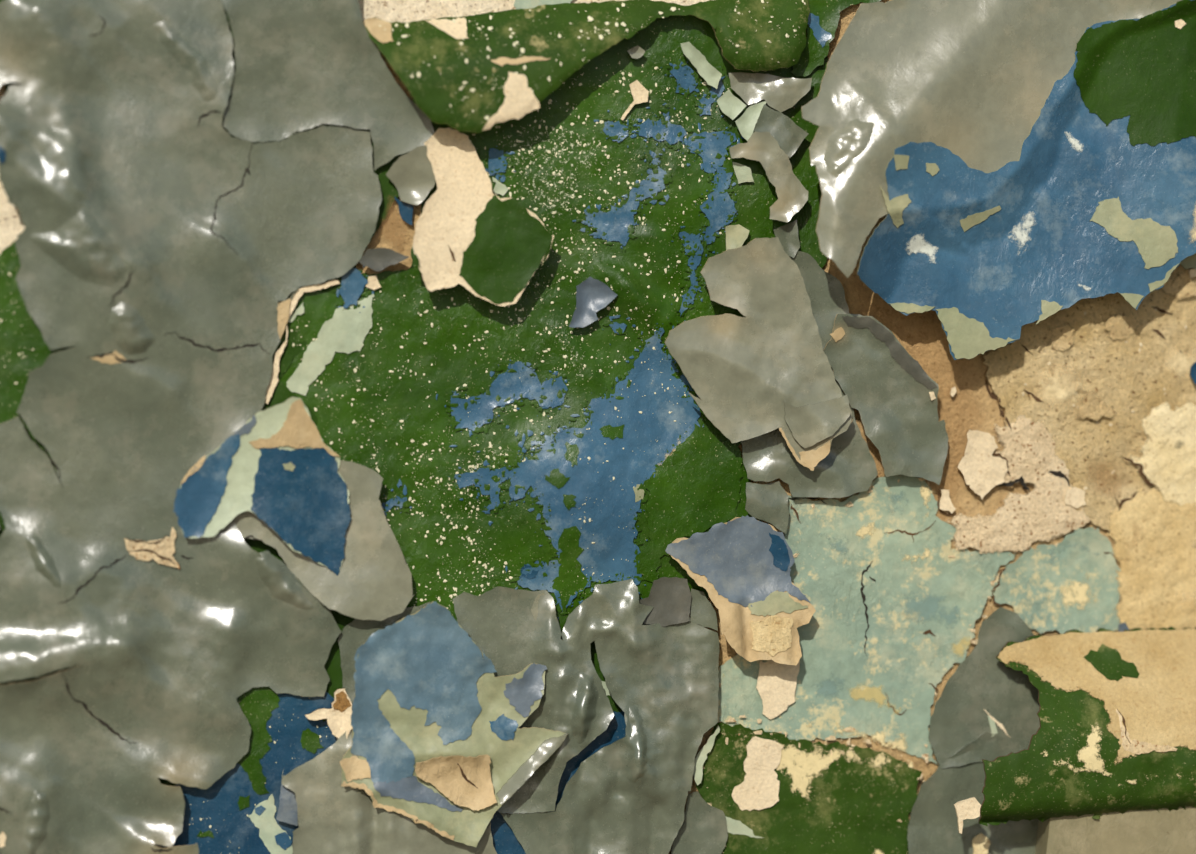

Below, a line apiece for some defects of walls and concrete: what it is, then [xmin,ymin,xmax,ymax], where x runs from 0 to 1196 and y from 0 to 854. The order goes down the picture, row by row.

peeling [621,80,649,121]
crack [210,144,253,252]
peeling [359,128,554,306]
peeling [665,42,957,485]
crack [86,332,269,363]
peeling [173,397,413,621]
crack [884,489,952,543]
spalling [950,415,1090,554]
crack [58,556,126,604]
peeling [639,481,816,665]
crack [860,562,876,656]
crack [62,675,137,743]